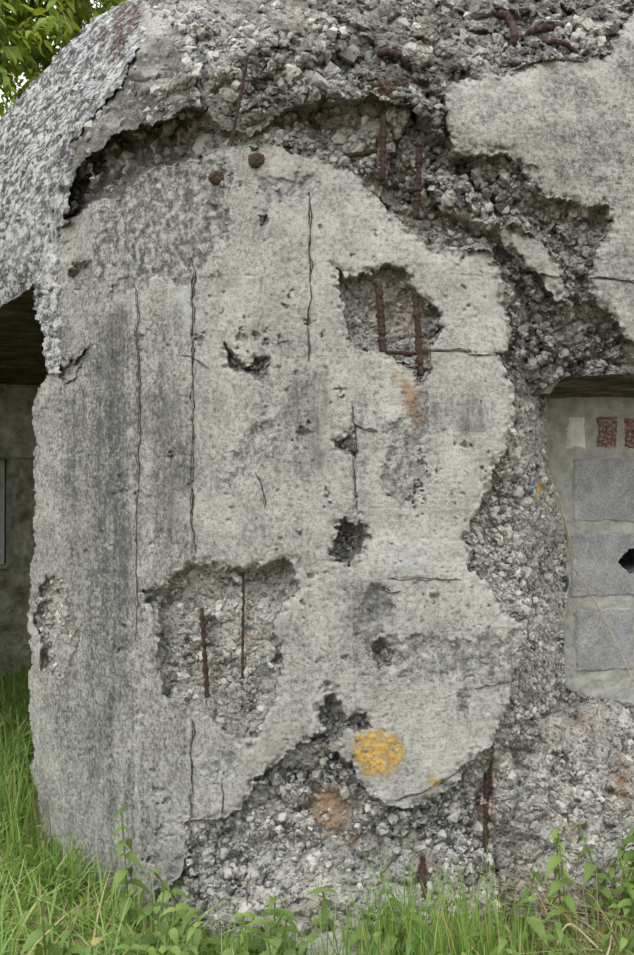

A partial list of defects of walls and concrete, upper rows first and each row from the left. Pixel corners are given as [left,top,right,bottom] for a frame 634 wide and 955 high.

spalling [0,71,66,178]
spalling [0,181,58,285]
spalling [68,261,93,290]
peeling [239,168,322,209]
spalling [58,344,93,385]
crack [182,260,209,552]
spalling [224,342,271,380]
peeling [221,414,280,493]
spalling [334,264,444,506]
spalling [329,517,372,567]
spalling [33,574,80,680]
spalling [142,559,301,738]